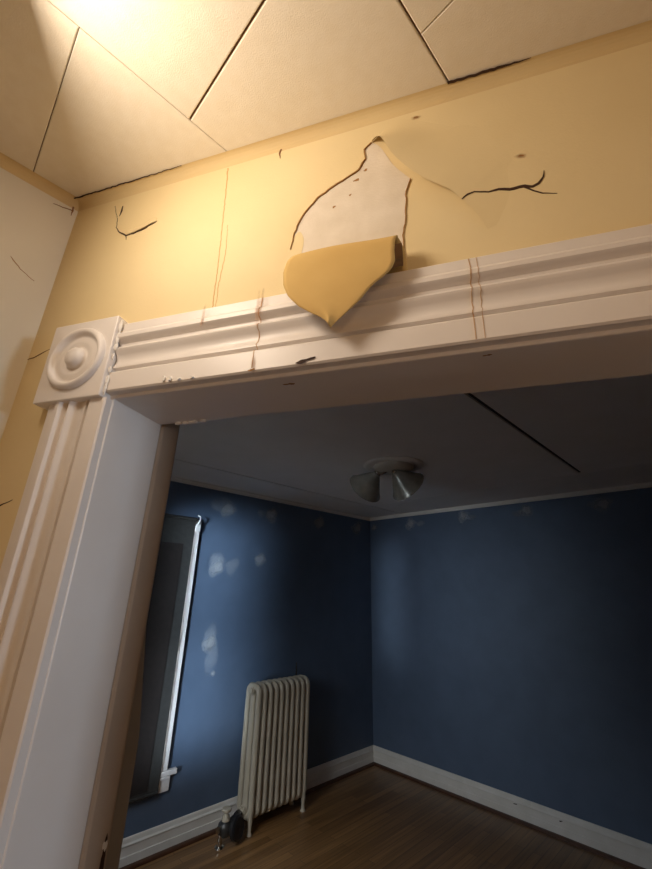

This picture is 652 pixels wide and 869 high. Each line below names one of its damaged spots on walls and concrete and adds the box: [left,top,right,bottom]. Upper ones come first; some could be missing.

crack [447,58,530,84]
crack [53,165,182,238]
flaking render [294,143,410,253]
crack [462,172,557,199]
crack [251,298,263,368]